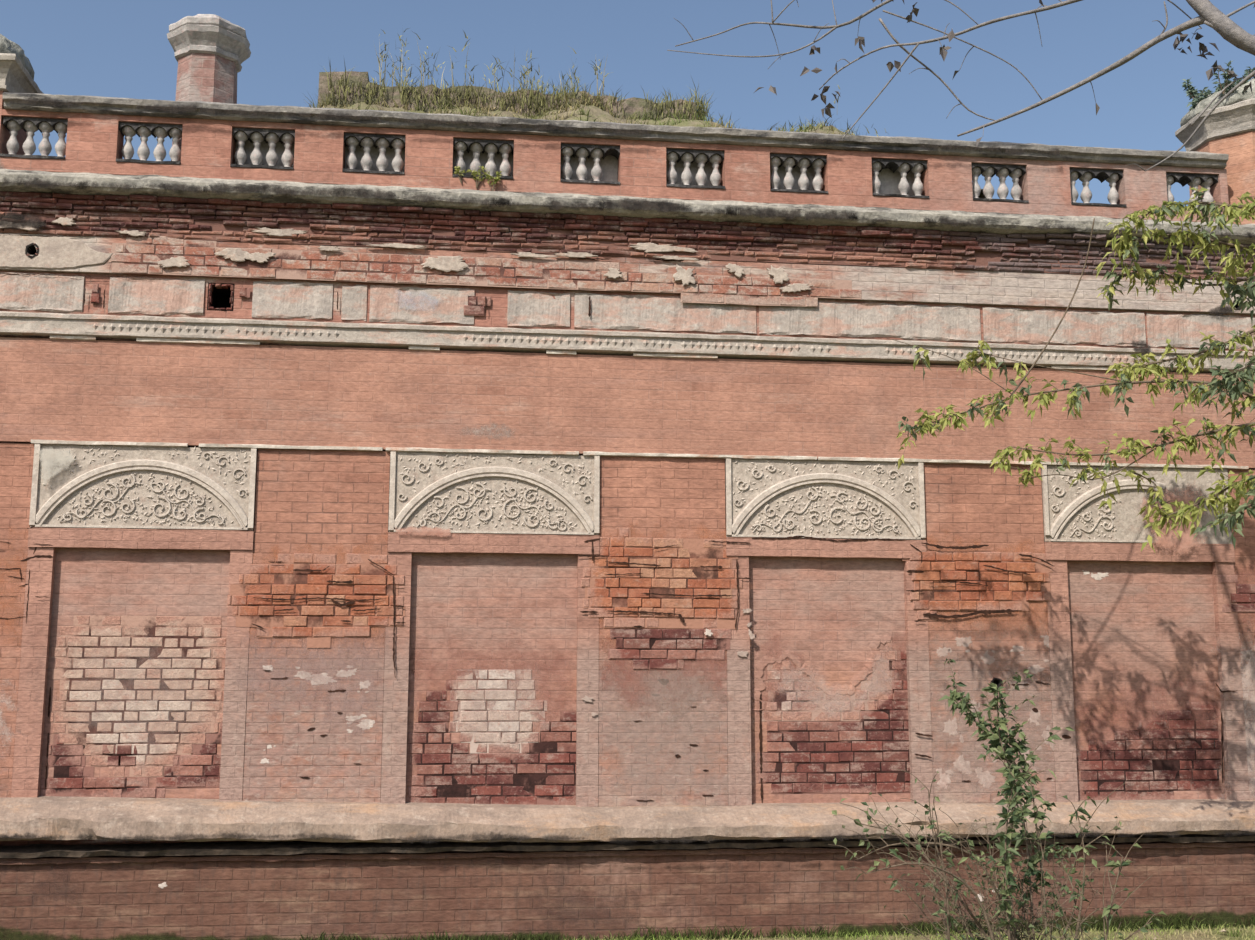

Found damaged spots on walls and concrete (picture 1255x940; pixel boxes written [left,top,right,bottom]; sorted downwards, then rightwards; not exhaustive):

spalling [0,217,862,316]
crack [0,526,53,624]
flaking render [40,553,405,798]
crack [251,559,405,678]
spalling [407,669,598,805]
spalling [581,527,911,794]
peeling [936,717,1005,798]
spalling [902,540,1053,700]
peeling [1082,570,1109,580]
spalling [1022,700,1224,800]
peeling [1239,632,1255,784]